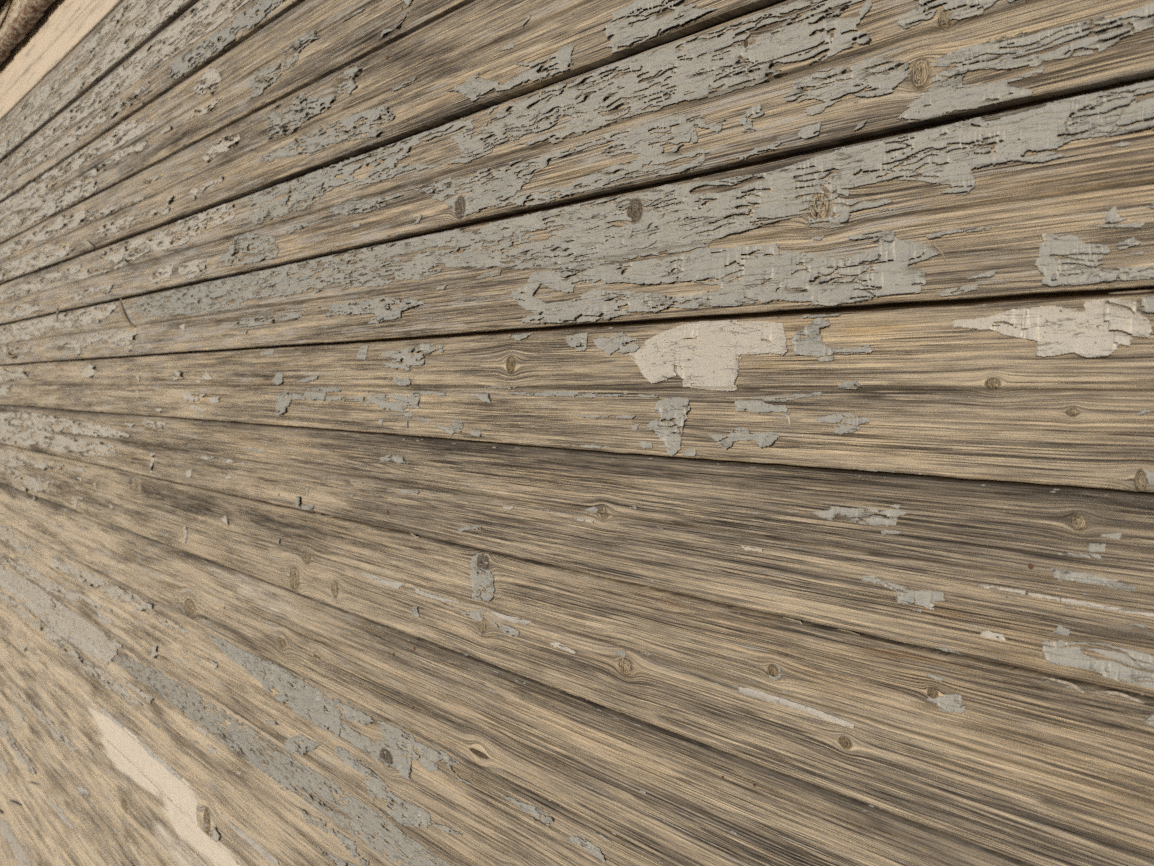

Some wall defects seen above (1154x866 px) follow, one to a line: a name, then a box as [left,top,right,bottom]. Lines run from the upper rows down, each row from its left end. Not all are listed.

peeling [0,0,1154,456]
peeling [0,408,166,493]
peeling [185,448,267,479]
peeling [380,454,410,463]
peeling [788,504,906,536]
peeling [1047,533,1137,591]
peeling [362,553,532,637]
peeling [550,641,577,654]
peeling [979,631,1006,641]
peeling [1041,624,1154,689]
peeling [0,525,471,866]
peeling [491,792,552,826]